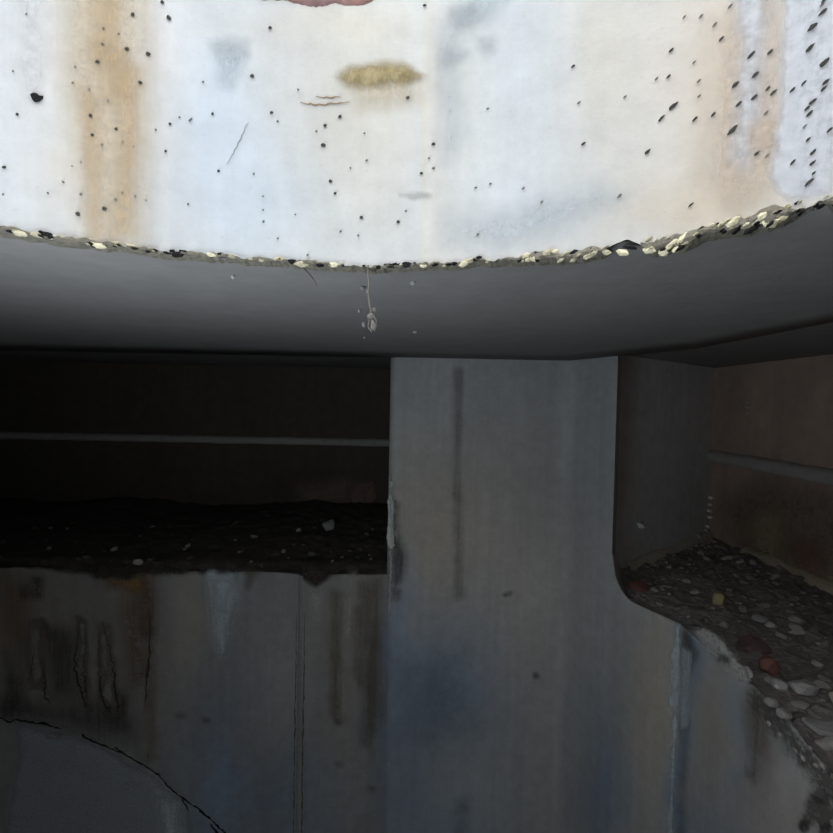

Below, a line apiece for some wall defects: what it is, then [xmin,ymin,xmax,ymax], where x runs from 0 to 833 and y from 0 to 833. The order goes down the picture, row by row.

corrosion [79,0,131,234]
efflorescence [738,0,763,153]
efflorescence [773,0,833,197]
hole [803,78,830,129]
spalling [0,195,833,274]
crack [0,717,61,729]
crack [82,734,226,833]